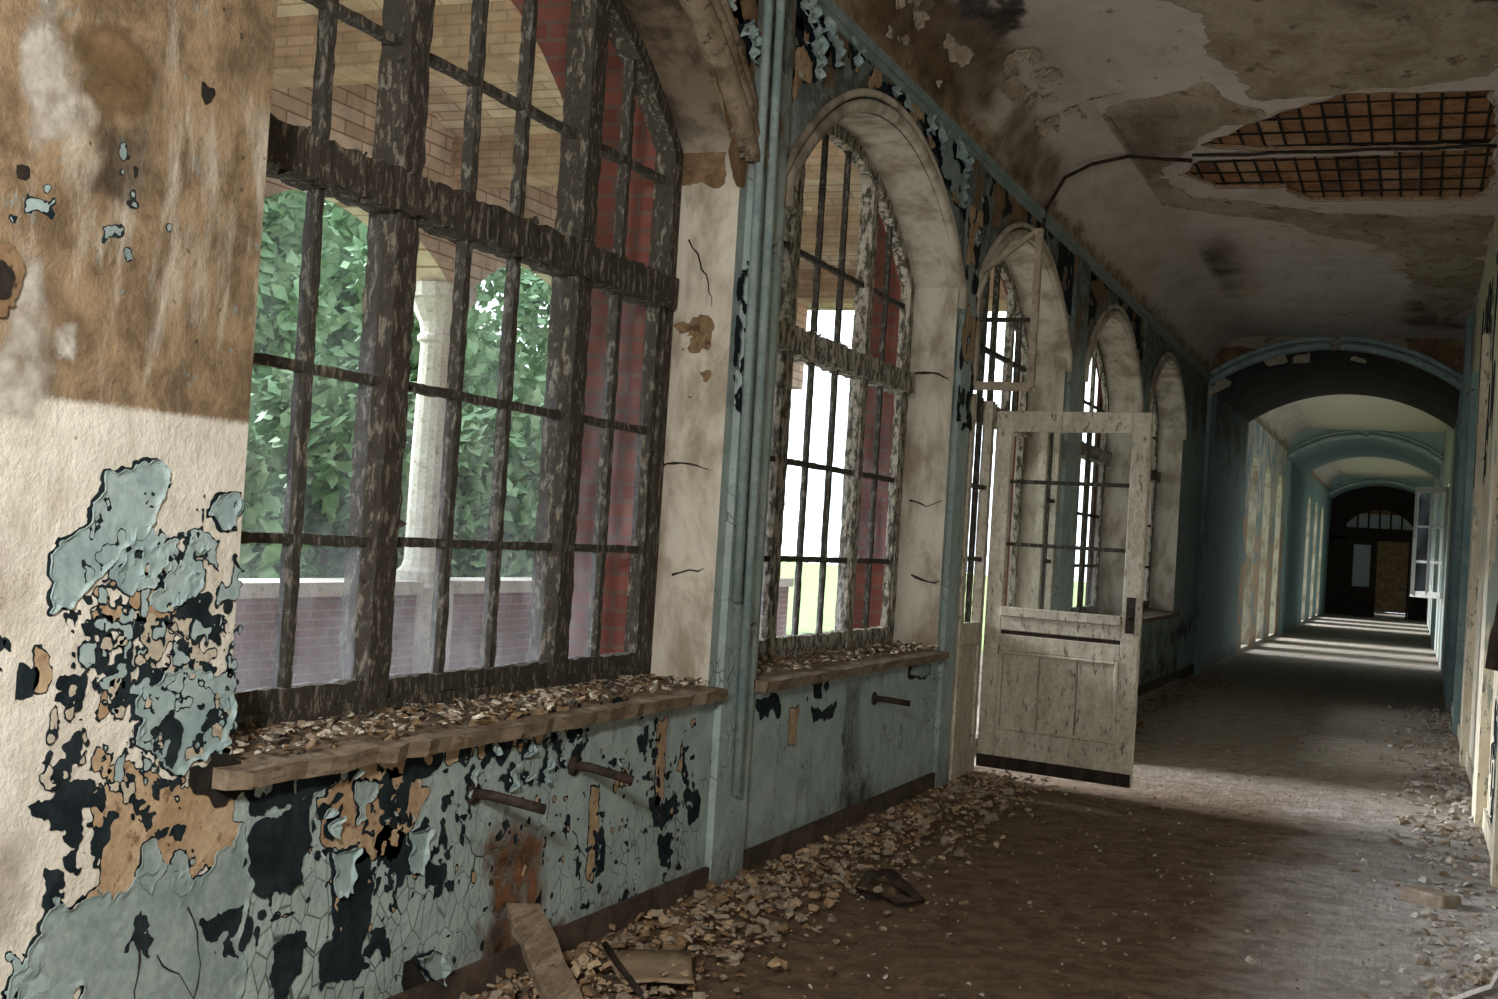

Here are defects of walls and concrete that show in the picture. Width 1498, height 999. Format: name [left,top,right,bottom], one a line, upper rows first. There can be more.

damp [21,0,155,136]
damp [870,0,1026,106]
peeling [682,69,746,189]
spalling [0,242,25,317]
peeling [8,164,56,223]
damp [0,265,75,417]
peeling [102,142,139,262]
peeling [673,239,715,354]
peeling [733,261,749,413]
peeling [1002,0,1498,488]
peeling [0,457,708,999]
peeling [756,640,939,747]